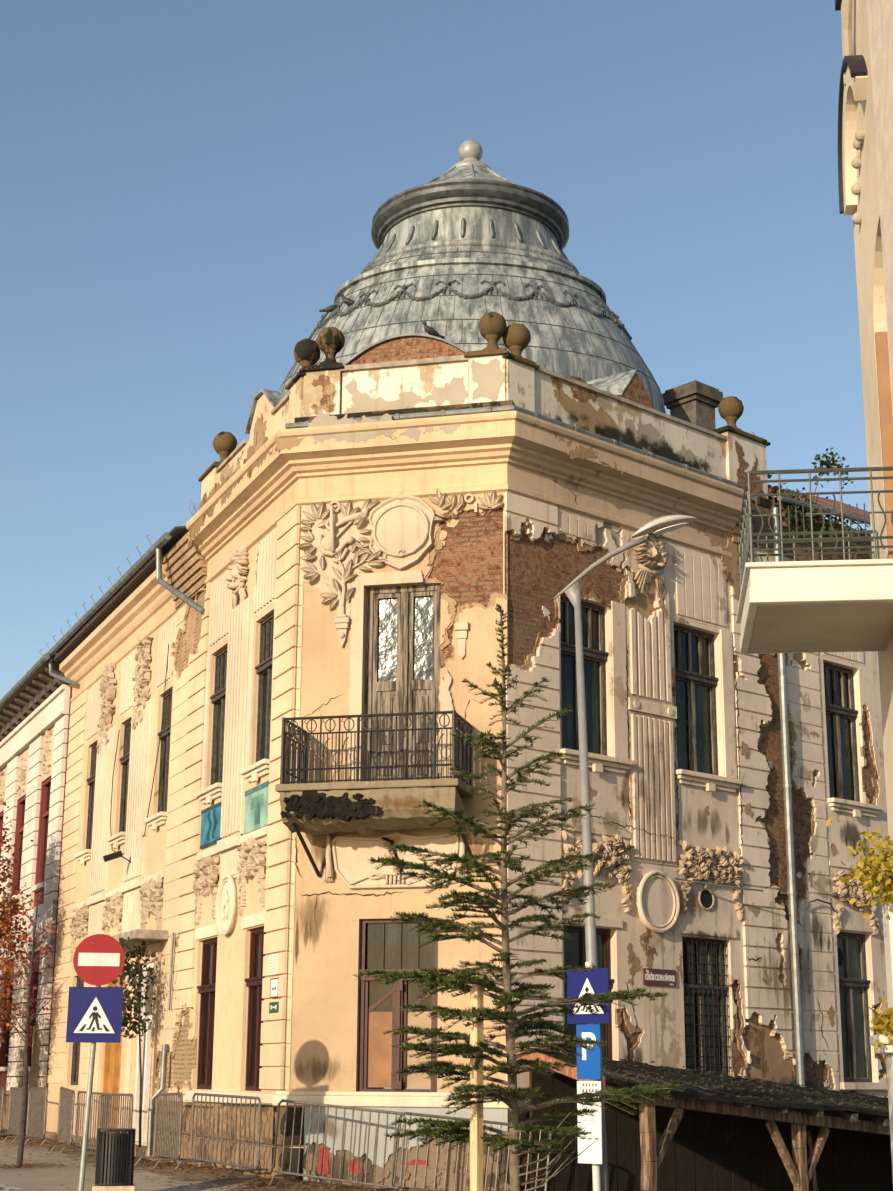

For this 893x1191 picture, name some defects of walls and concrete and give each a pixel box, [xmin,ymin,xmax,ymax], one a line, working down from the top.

peeling [311,358,505,415]
peeling [550,376,696,465]
flaking render [425,507,689,671]
flaking render [740,653,817,924]
flaking render [859,704,879,805]
flaking render [763,935,782,985]
flaking render [156,1007,197,1097]
flaking render [615,1007,643,1061]
flaking render [729,979,835,1090]